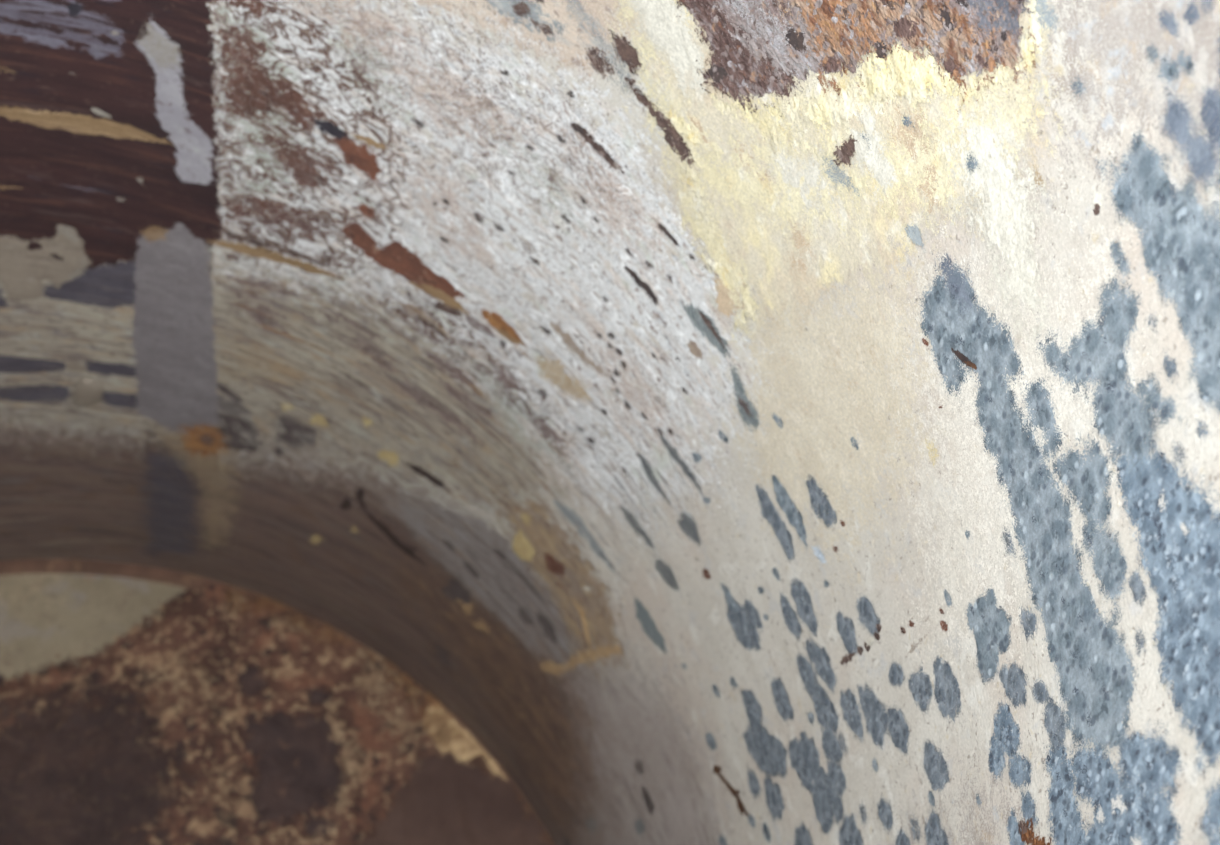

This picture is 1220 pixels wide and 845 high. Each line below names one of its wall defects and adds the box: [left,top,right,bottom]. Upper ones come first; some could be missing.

peeling [0,224,92,301]
peeling [0,0,215,186]
rust [0,0,529,349]
peeling [1093,191,1103,216]
rust [0,584,549,845]
rust [1018,817,1052,845]